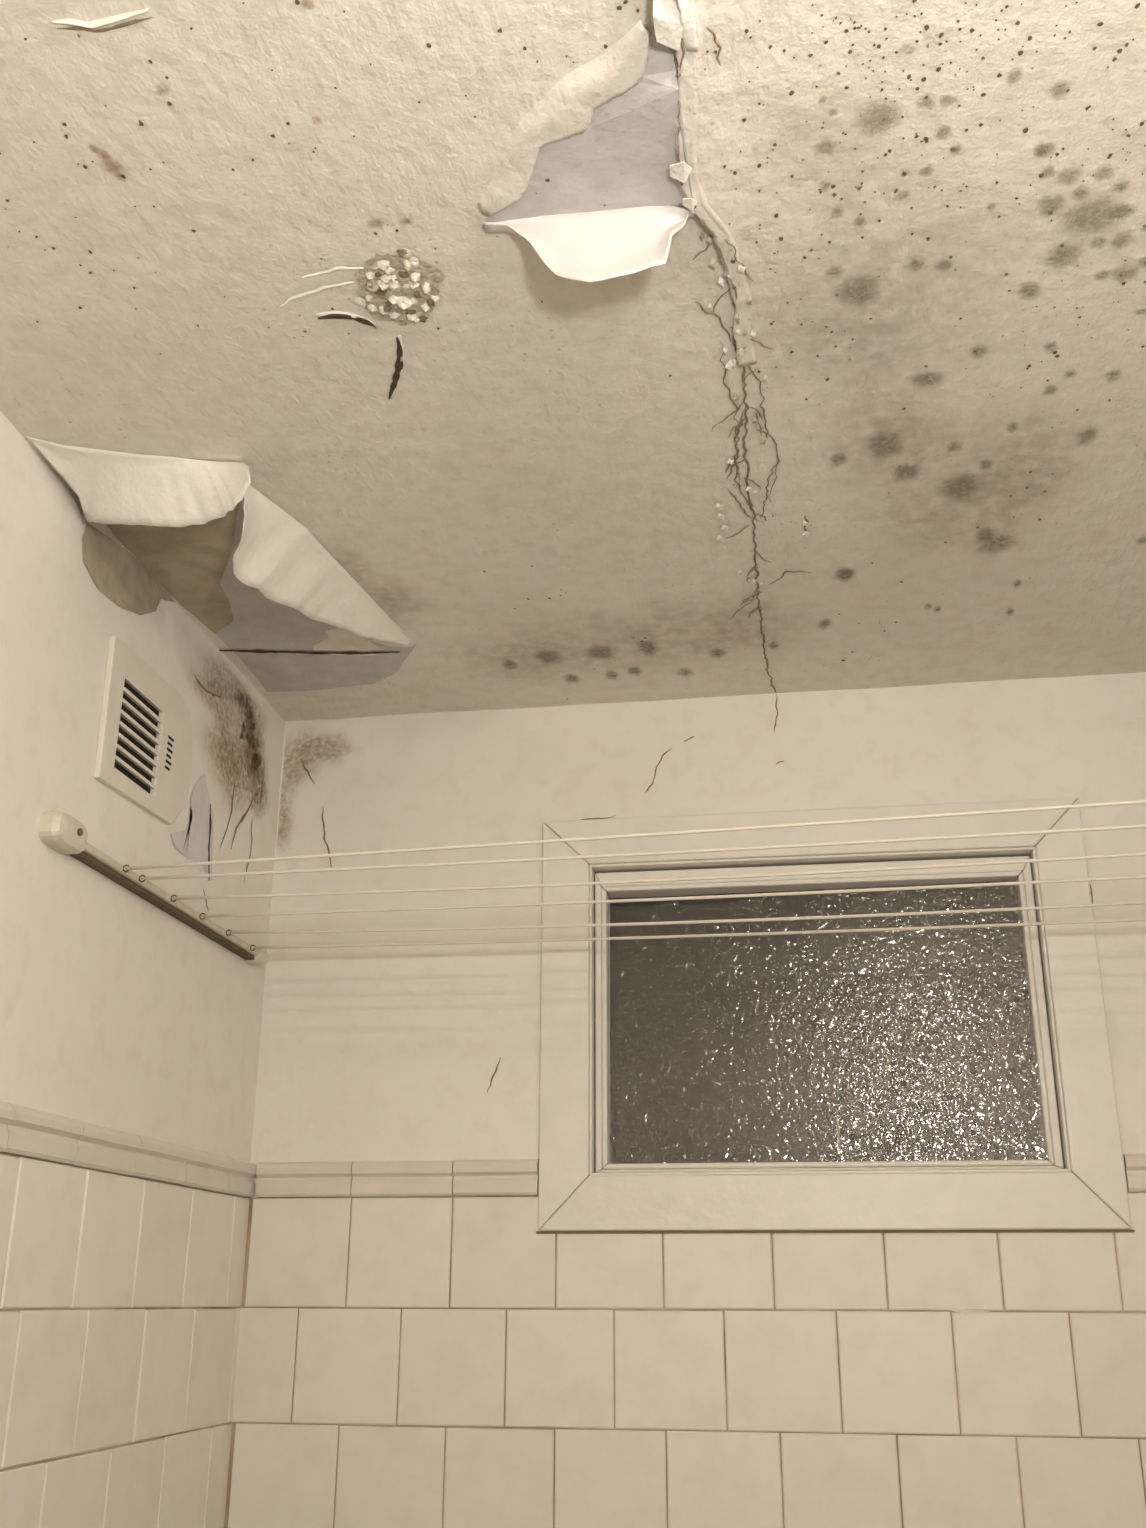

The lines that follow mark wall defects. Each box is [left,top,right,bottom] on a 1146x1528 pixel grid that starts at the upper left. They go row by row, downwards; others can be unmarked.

peeling [478,0,698,283]
crack [674,0,810,764]
damp [769,0,1038,128]
damp [806,85,1001,239]
damp [1005,245,1093,338]
damp [1015,118,1146,303]
peeling [26,436,419,692]